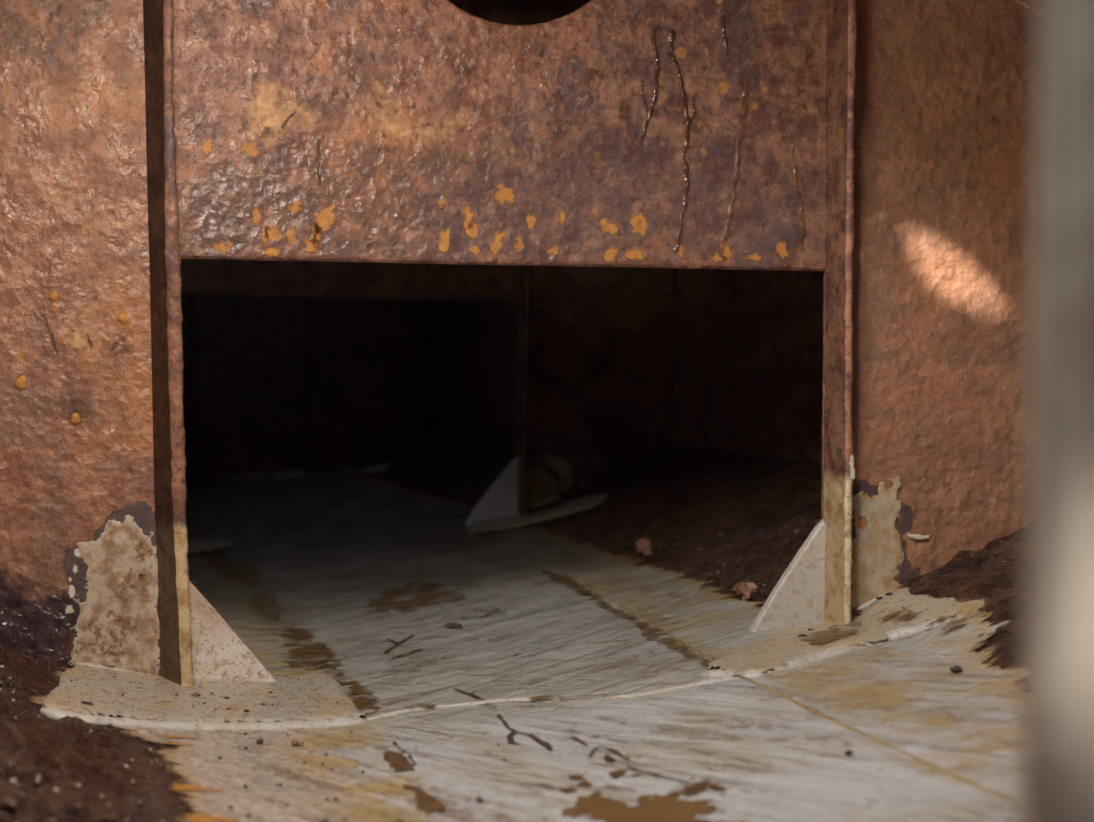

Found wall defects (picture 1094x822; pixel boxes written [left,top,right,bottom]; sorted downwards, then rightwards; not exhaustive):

corrosion [639,29,696,257]
corrosion [493,184,515,206]
corrosion [710,146,740,264]
corrosion [212,241,233,255]
corrosion [252,204,336,257]
corrosion [438,229,450,252]
corrosion [463,206,536,256]
corrosion [600,213,648,262]
corrosion [776,242,789,259]
corrosion [66,331,89,353]
peeling [52,501,160,685]
peeling [78,455,1023,822]